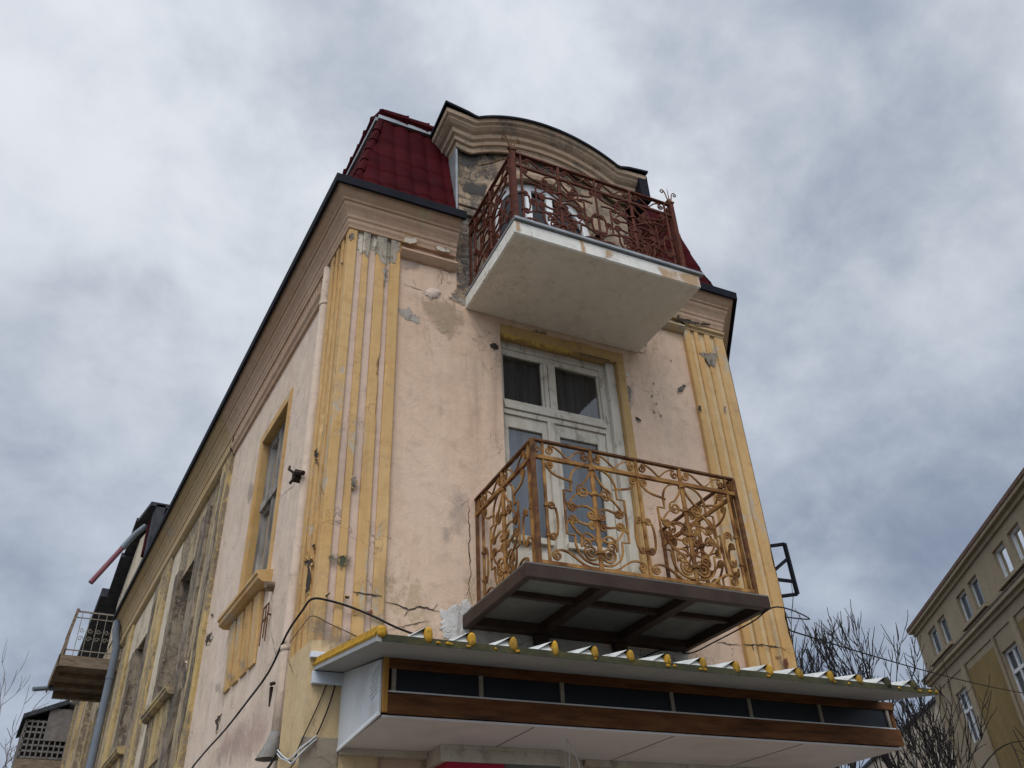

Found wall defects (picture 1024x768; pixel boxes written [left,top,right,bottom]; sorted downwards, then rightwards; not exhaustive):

peeling [348,232,418,288]
flaking render [699,352,717,368]
crack [460,499,472,601]
flaking render [151,471,225,768]
crack [355,592,440,630]